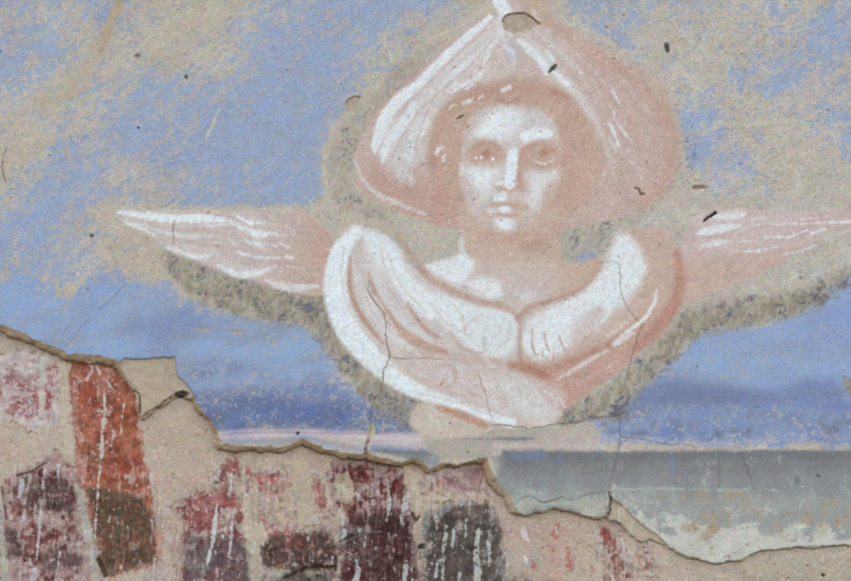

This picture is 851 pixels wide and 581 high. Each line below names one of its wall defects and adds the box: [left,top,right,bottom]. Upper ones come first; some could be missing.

peeling [502,12,541,34]
crack [363,280,445,456]
flaking render [0,325,851,581]
crack [477,260,697,516]